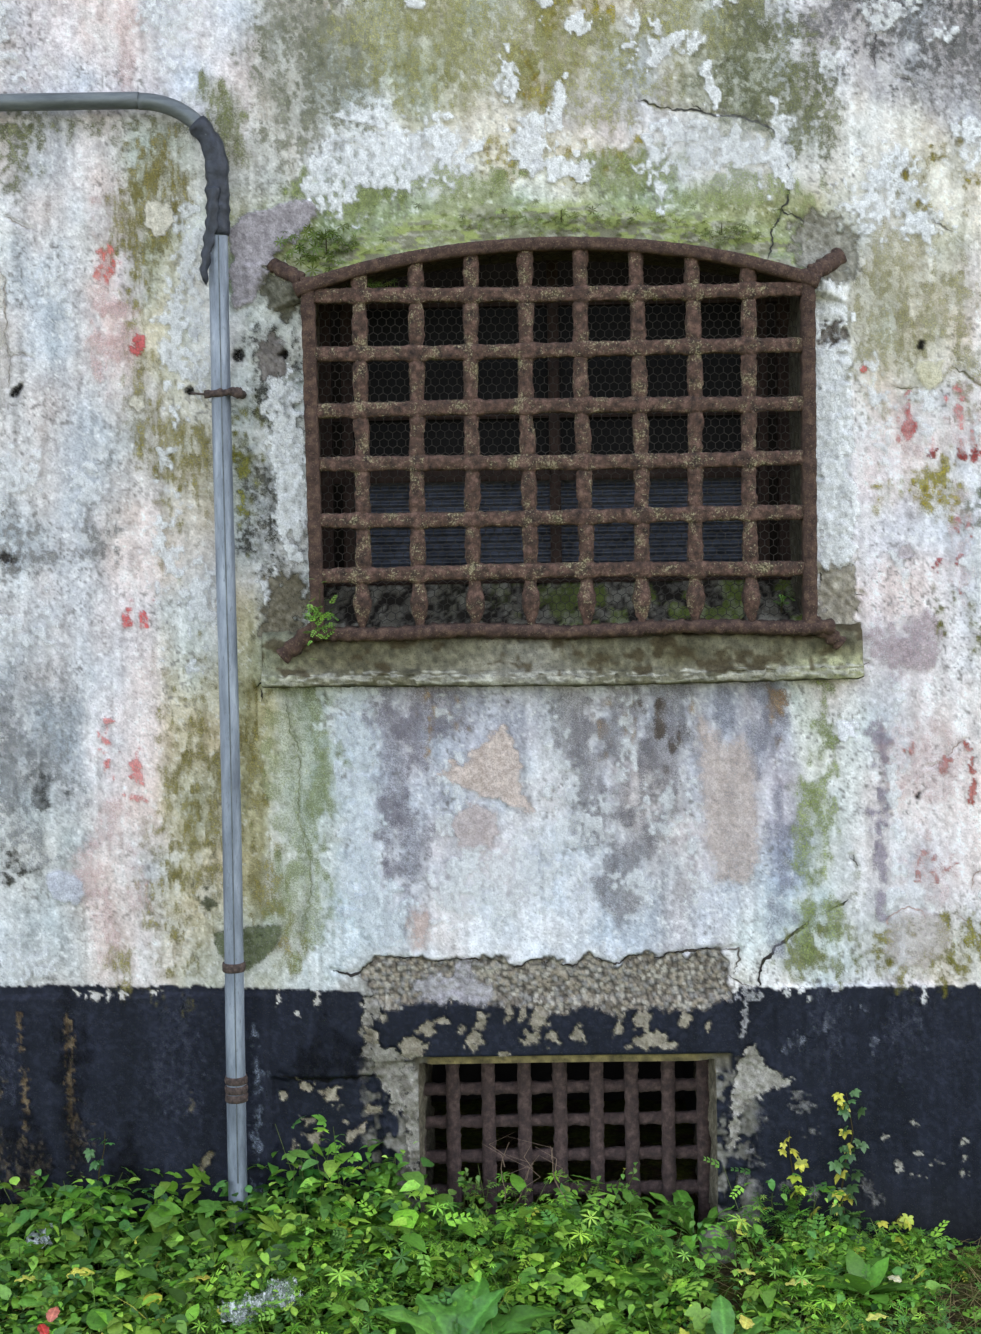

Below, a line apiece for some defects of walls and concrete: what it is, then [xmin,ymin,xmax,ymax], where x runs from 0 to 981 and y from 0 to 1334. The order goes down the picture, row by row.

peeling [564,10,592,36]
peeling [492,43,595,184]
peeling [621,9,796,215]
crack [638,99,804,258]
crack [3,281,31,387]
leakage [192,880,217,911]
flaking render [334,686,816,1184]
peeling [292,1118,323,1151]
peeling [279,1078,342,1106]
peeling [860,1178,885,1205]